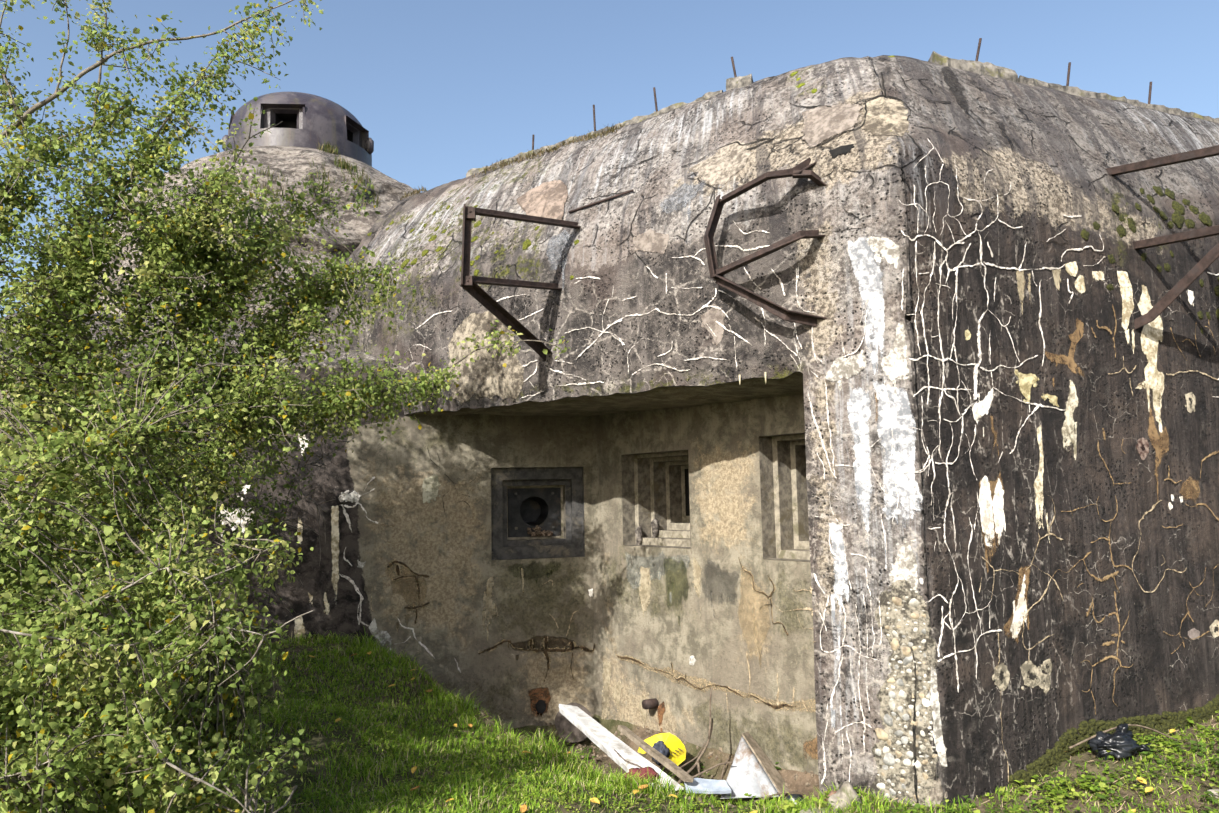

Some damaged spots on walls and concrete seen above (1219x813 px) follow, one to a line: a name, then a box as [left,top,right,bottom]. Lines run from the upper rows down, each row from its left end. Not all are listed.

damp [1052,261,1164,432]
crack [340,70,1219,804]
damp [825,236,923,569]
damp [972,368,995,437]
damp [978,476,1006,547]
damp [1034,425,1050,543]
damp [1062,380,1079,459]
corrosion [1148,407,1169,500]
corrosion [1180,477,1200,505]
corrosion [386,561,426,633]
damp [830,523,849,661]
damp [1010,574,1028,638]